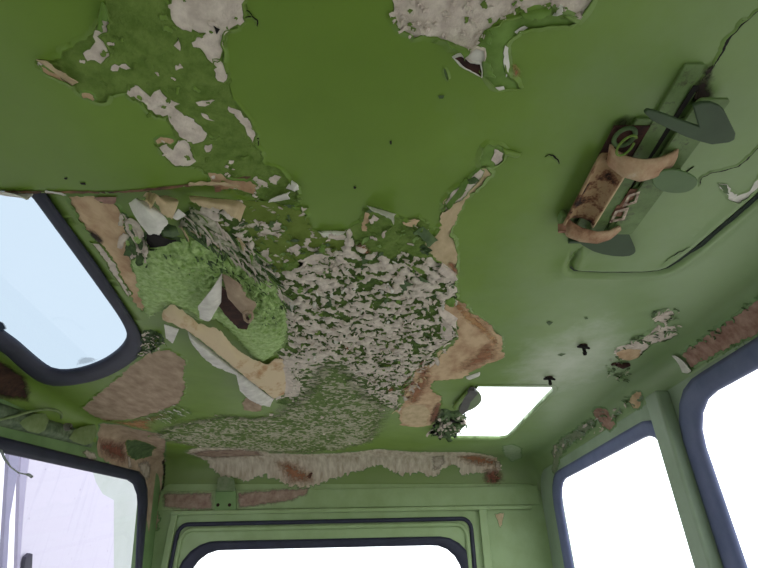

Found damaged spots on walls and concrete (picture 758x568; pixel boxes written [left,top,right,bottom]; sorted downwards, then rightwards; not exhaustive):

peeling [385,0,598,92]
rust [591,178,640,228]
peeling [30,0,522,531]
peeling [605,308,682,383]
rust [485,462,501,483]
peeling [551,390,644,475]